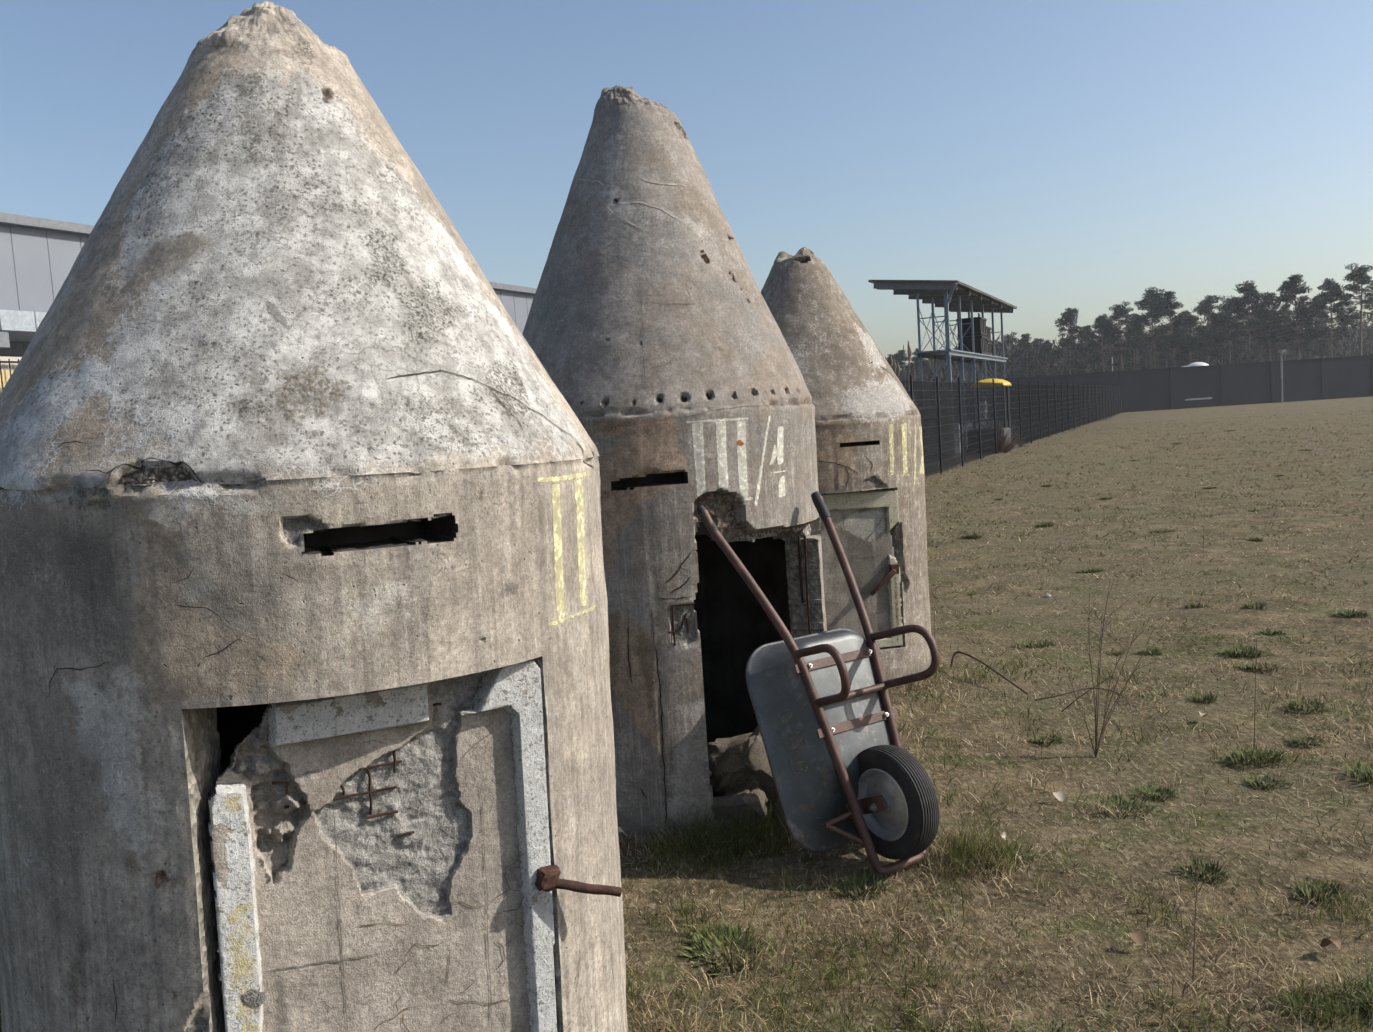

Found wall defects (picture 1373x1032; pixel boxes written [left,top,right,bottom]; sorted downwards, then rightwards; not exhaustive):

spalling [119,465,196,488]
spalling [693,491,817,541]
crack [173,568,254,659]
crack [49,661,108,691]
crack [265,789,523,1032]